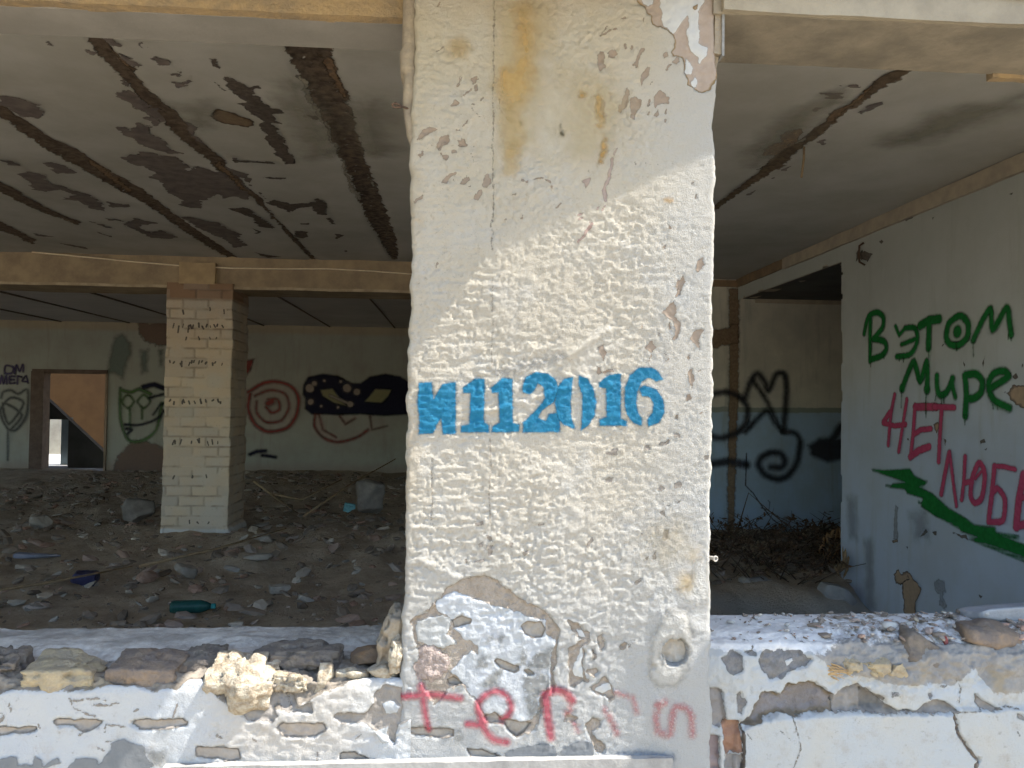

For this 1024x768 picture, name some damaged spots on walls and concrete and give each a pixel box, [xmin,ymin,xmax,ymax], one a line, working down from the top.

peeling [637,0,717,93]
peeling [116,59,344,248]
rust [579,93,606,163]
peeling [0,160,177,239]
spalling [409,521,615,737]
spalling [0,703,40,737]
spalling [53,697,188,751]
spalling [195,734,241,762]
spalling [244,684,454,743]
spalling [467,748,499,756]
spalling [709,649,959,768]
crack [953,680,1019,768]